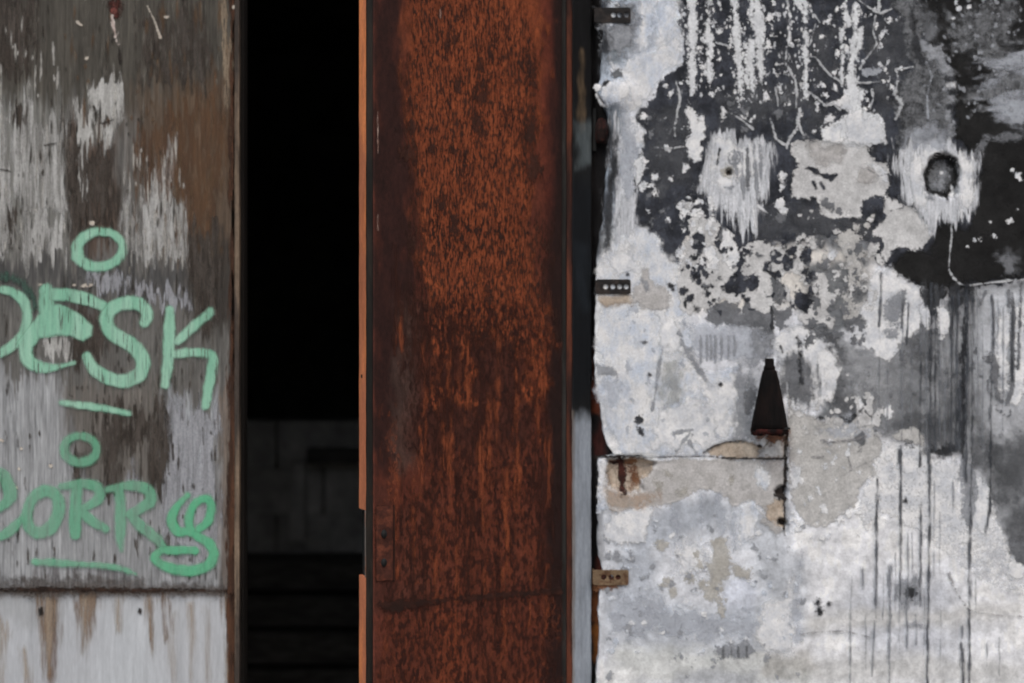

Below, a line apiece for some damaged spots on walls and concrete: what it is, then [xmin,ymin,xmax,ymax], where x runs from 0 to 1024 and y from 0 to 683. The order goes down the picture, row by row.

peeling [0,0,229,374]
corrosion [378,0,562,683]
crack [595,435,789,536]
peeling [595,0,1024,655]
damp [825,282,1024,683]